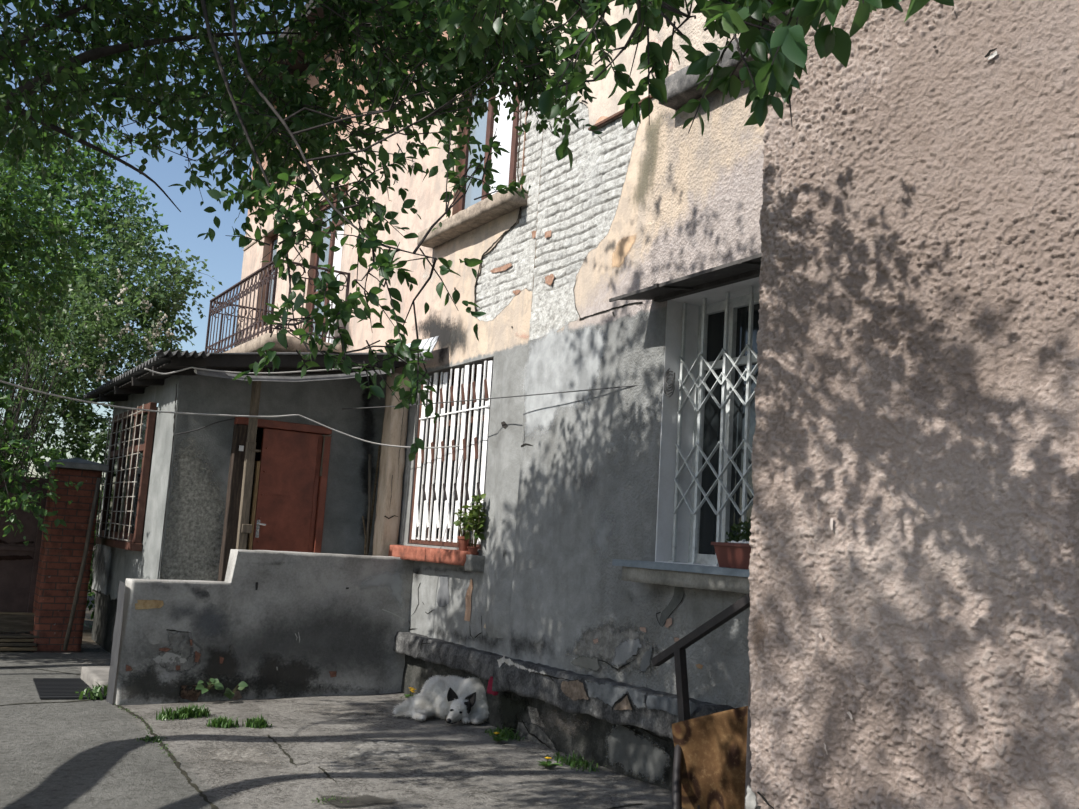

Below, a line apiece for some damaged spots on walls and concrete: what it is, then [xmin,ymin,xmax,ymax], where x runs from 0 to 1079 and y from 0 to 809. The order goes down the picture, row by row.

flaking render [474,74,641,340]
flaking render [159,629,201,672]
leakage [93,544,381,704]
flaking render [571,621,659,678]
flaking render [656,586,684,642]
flaking render [180,685,201,701]